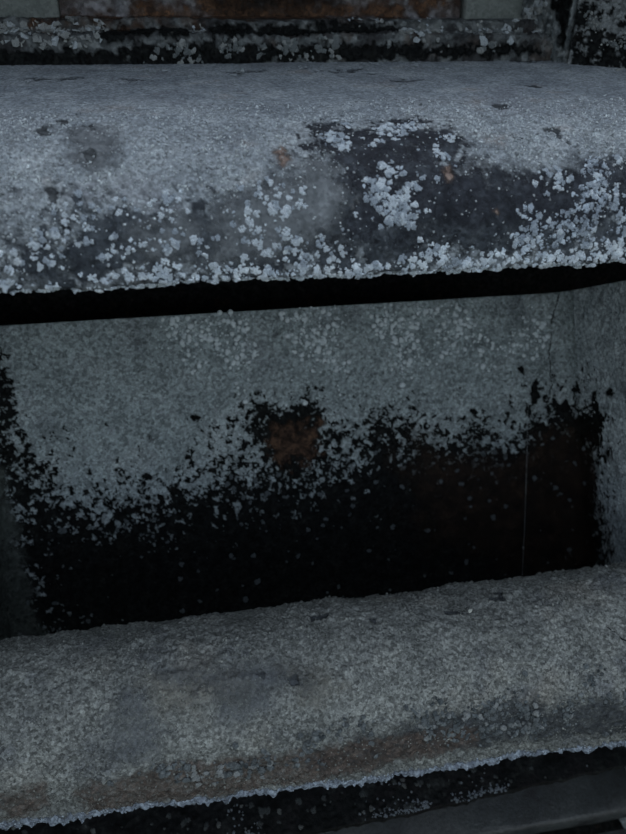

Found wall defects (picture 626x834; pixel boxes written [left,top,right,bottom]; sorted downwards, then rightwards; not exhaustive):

leakage [578,7,626,52]
leakage [0,119,626,295]
leakage [0,467,46,640]